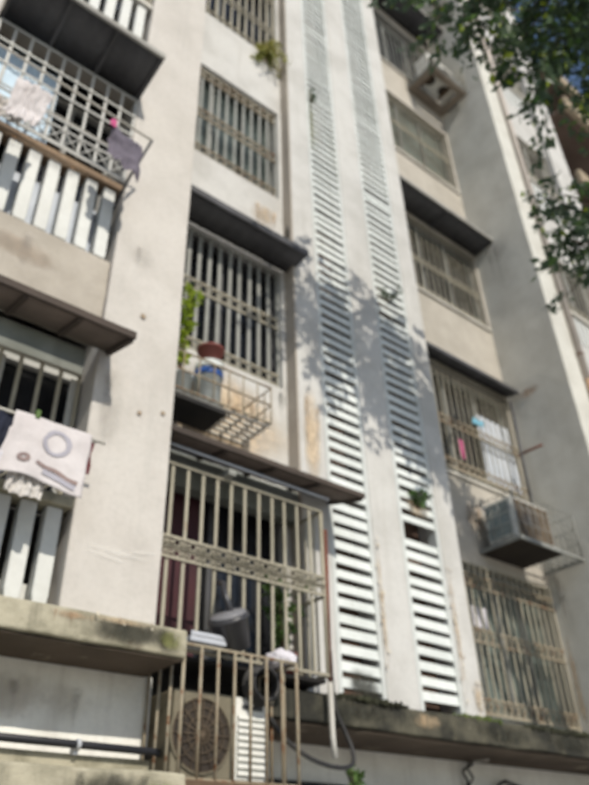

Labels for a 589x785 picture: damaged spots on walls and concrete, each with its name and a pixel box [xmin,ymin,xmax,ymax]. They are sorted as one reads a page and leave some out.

water stain [100,621,170,646]
water stain [336,674,378,720]
water stain [89,777,131,785]